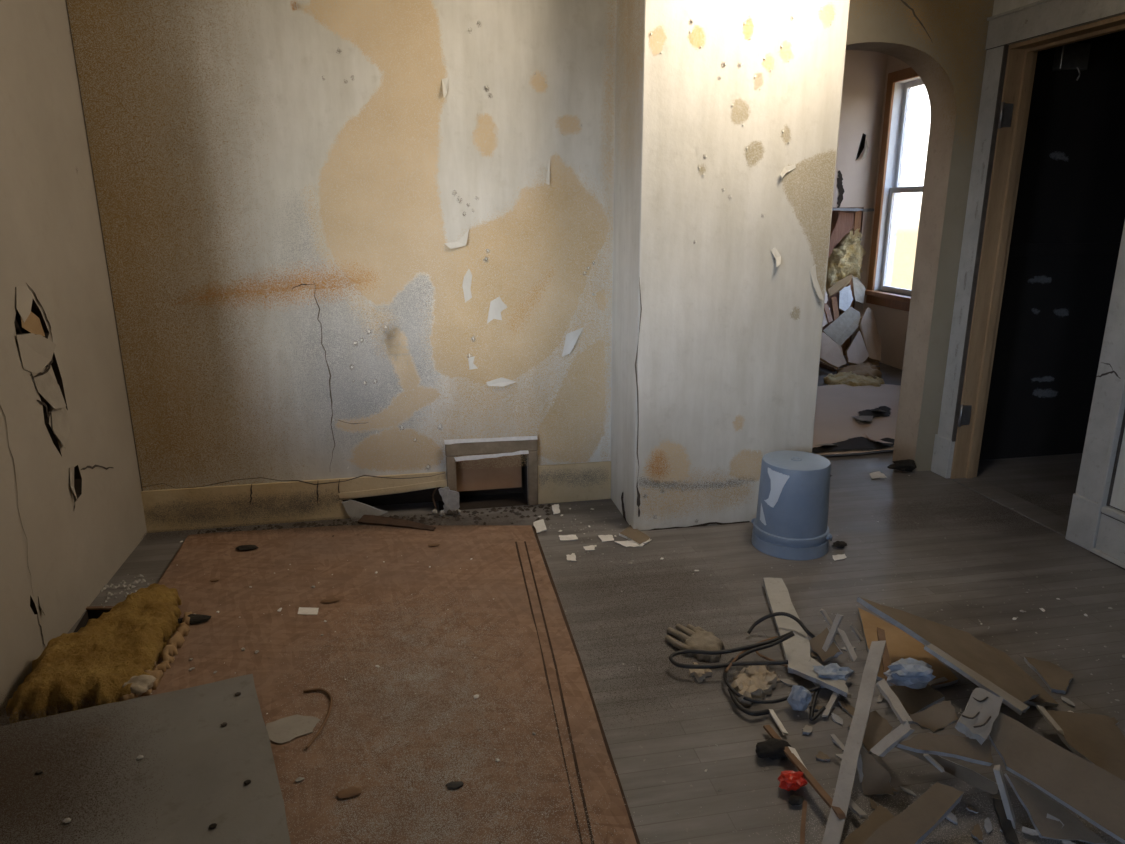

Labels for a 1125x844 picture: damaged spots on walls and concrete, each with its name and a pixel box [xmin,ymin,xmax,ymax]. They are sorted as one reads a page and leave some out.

spalling [16,283,70,448]
crack [65,0,443,503]
damp [66,0,644,541]
peeling [780,149,874,305]